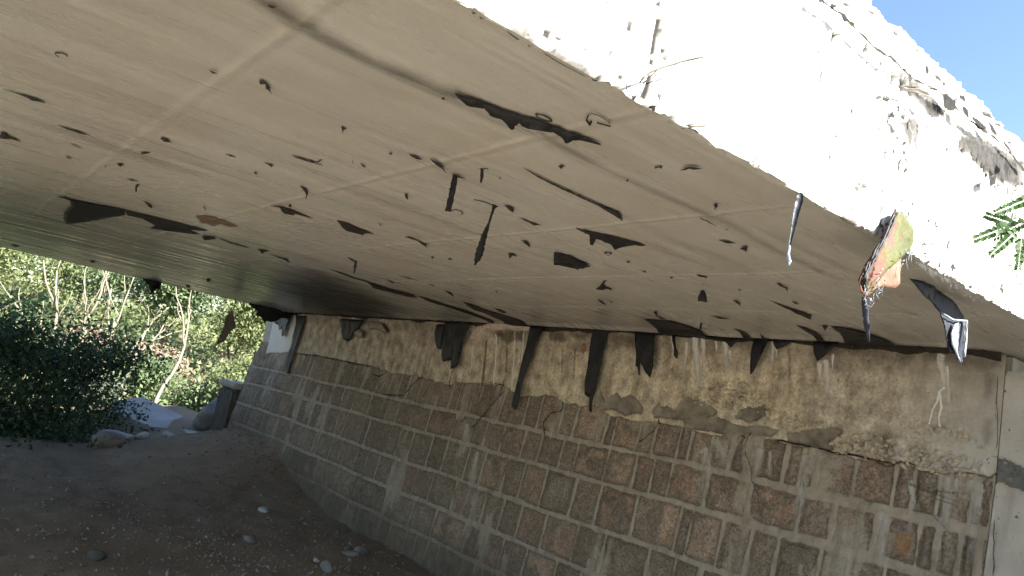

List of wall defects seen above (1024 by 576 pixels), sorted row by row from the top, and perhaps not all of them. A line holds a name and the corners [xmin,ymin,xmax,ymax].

crack [471,375,505,430]
leakage [671,337,732,384]
leakage [817,354,834,391]
leakage [928,353,984,428]
spalling [596,391,1024,491]
crack [774,439,874,460]